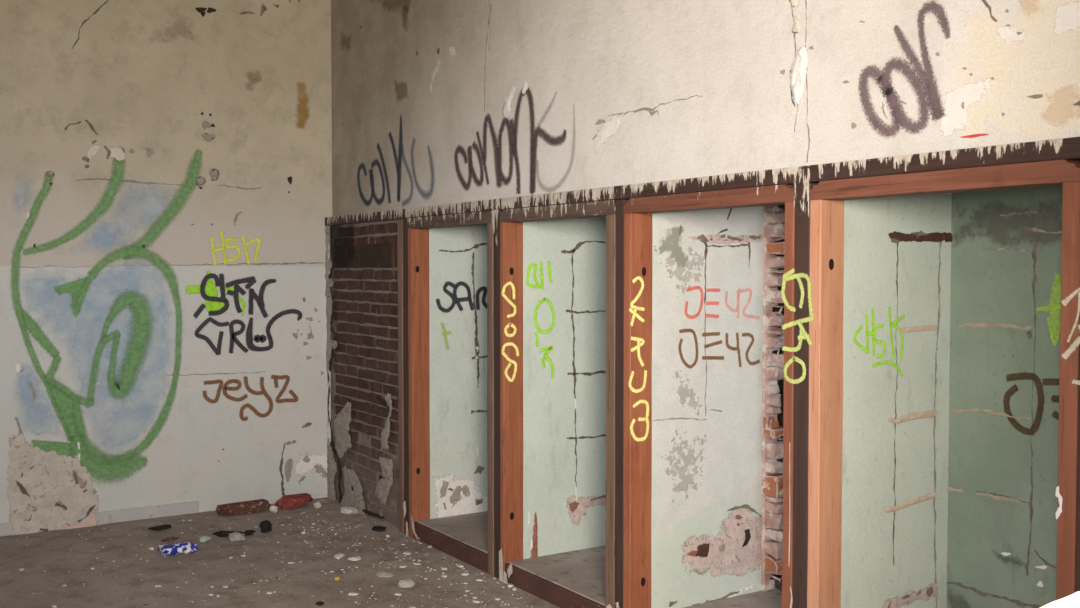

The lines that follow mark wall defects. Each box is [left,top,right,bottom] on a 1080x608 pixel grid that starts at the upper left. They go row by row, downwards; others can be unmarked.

crack [72,0,109,49]
crack [610,95,702,116]
peeling [285,0,1080,608]
flaking render [7,417,101,535]